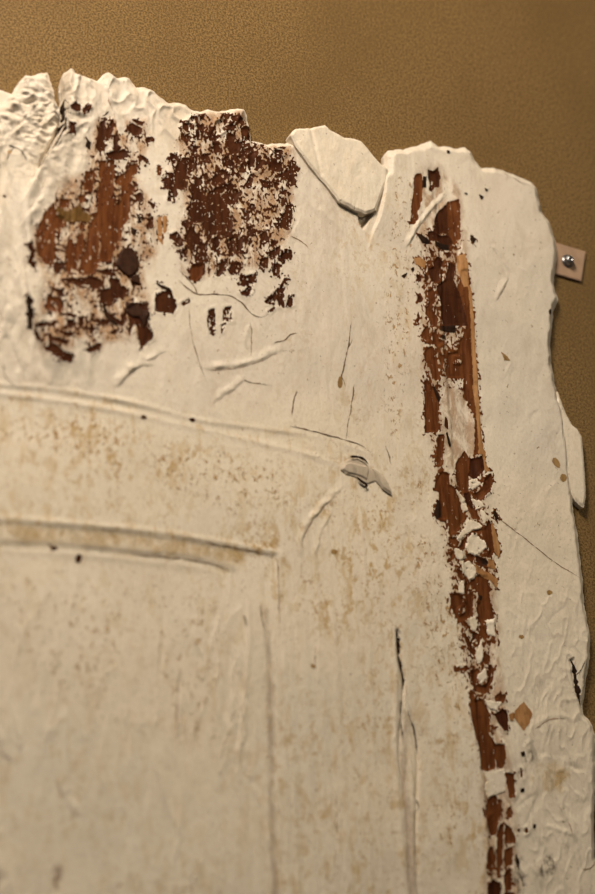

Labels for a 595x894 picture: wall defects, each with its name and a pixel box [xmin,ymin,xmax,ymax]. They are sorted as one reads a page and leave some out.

peeling [24,100,302,365]
peeling [402,167,536,894]
crack [396,629,417,752]
crack [570,659,587,706]